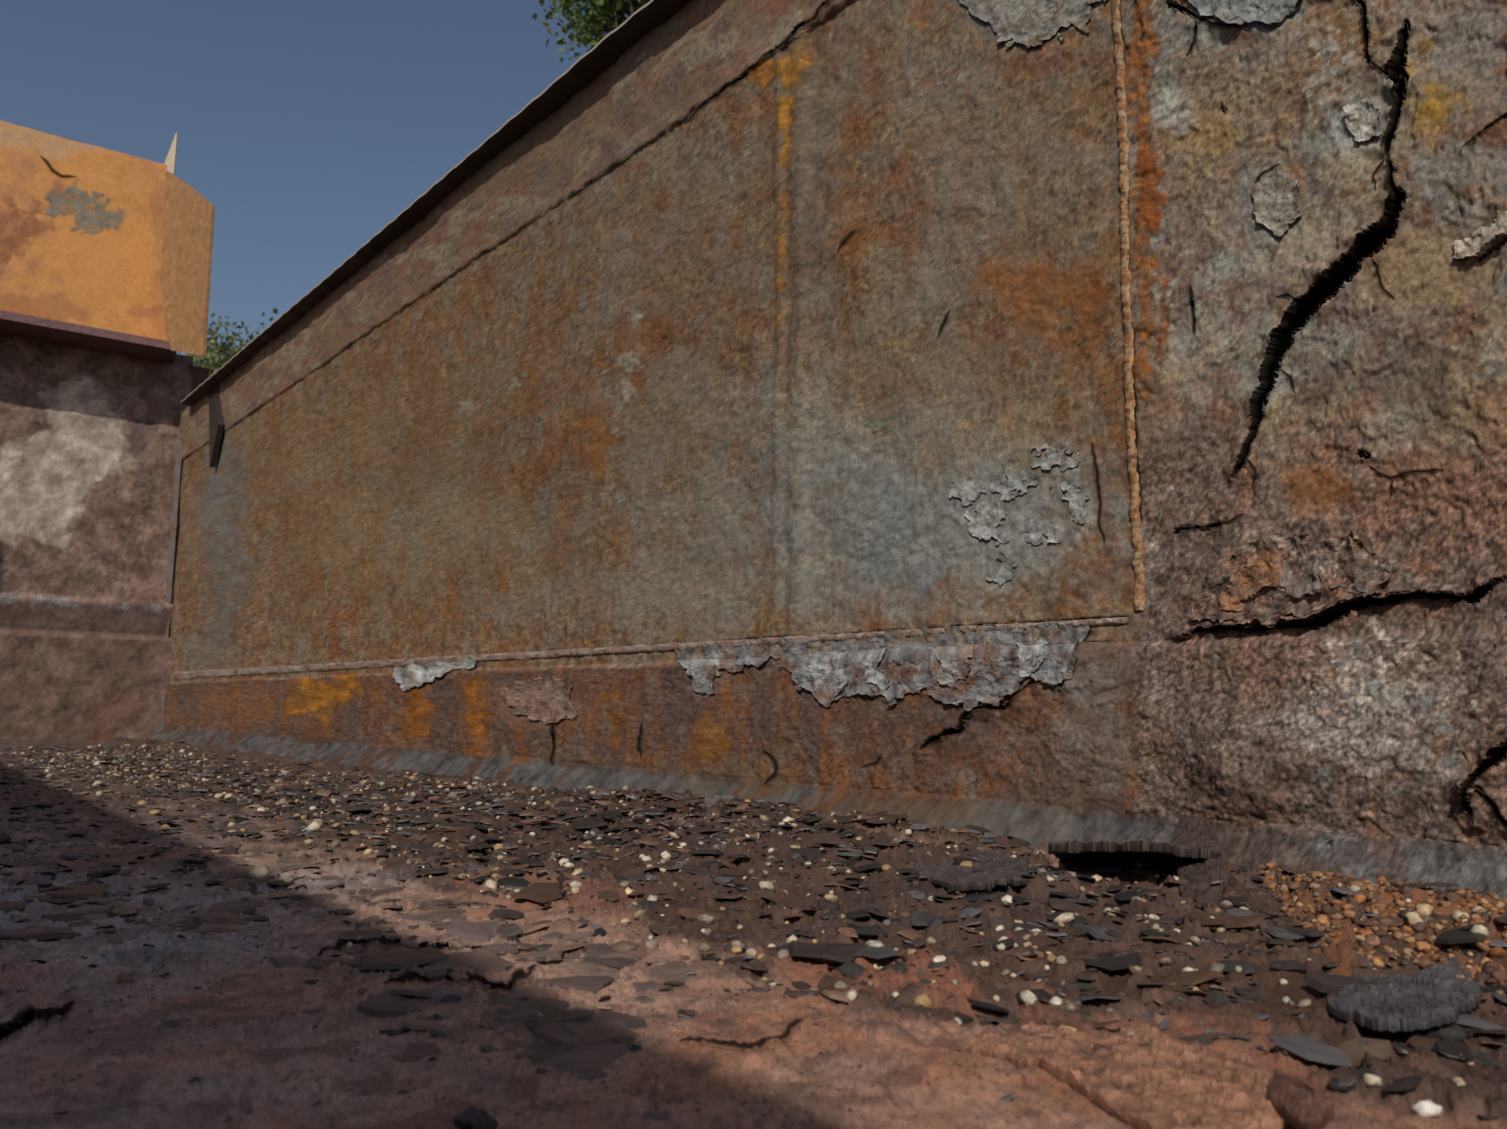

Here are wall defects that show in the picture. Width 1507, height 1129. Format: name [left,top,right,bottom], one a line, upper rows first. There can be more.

peeling [959,0,1107,48]
peeling [1188,0,1299,25]
rust [750,47,811,163]
rust [1125,0,1168,399]
crack [1090,0,1411,545]
peeling [1452,210,1507,259]
water stain [0,376,142,548]
crack [1182,575,1507,636]
rust [285,670,364,726]
peeling [674,621,1090,712]
crack [1457,736,1507,836]
crack [0,1000,75,1046]